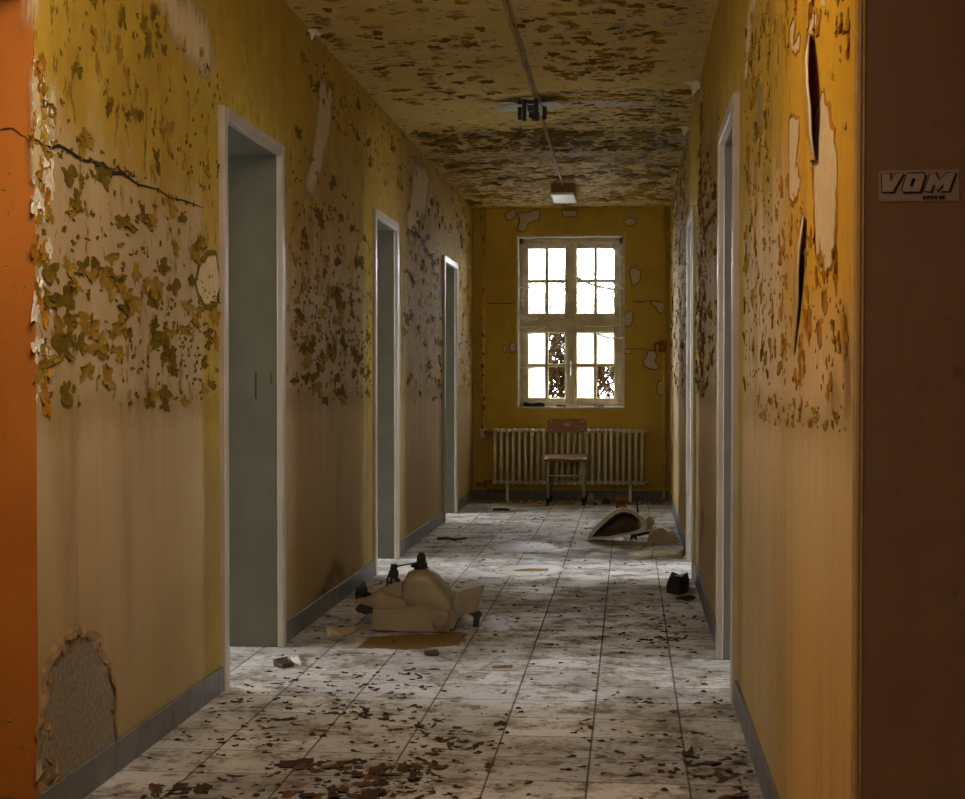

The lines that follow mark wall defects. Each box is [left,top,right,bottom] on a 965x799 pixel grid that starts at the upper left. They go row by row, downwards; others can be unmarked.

peeling [72,0,106,80]
crack [0,127,203,208]
peeling [12,51,221,418]
peeling [103,3,221,190]
flaking render [290,0,717,406]
flaking render [742,0,850,432]
spalling [20,622,119,786]